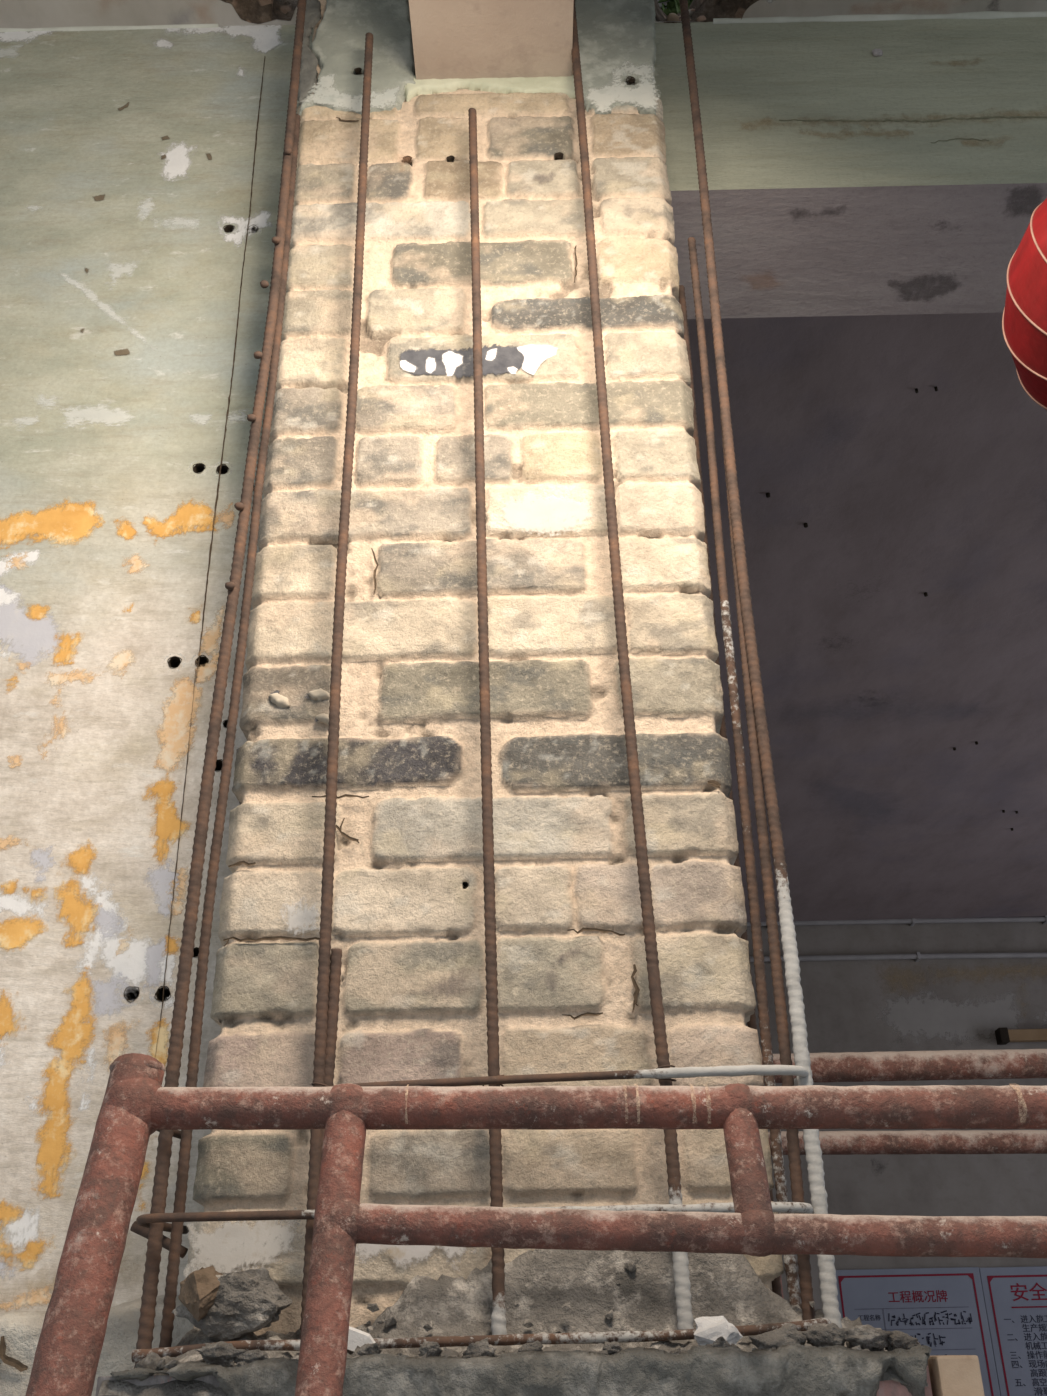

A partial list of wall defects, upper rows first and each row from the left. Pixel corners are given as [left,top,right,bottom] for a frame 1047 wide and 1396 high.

spalling [0,0,321,1278]
spalling [269,32,373,1087]
crack [0,1336,28,1372]
peeling [0,1286,51,1310]